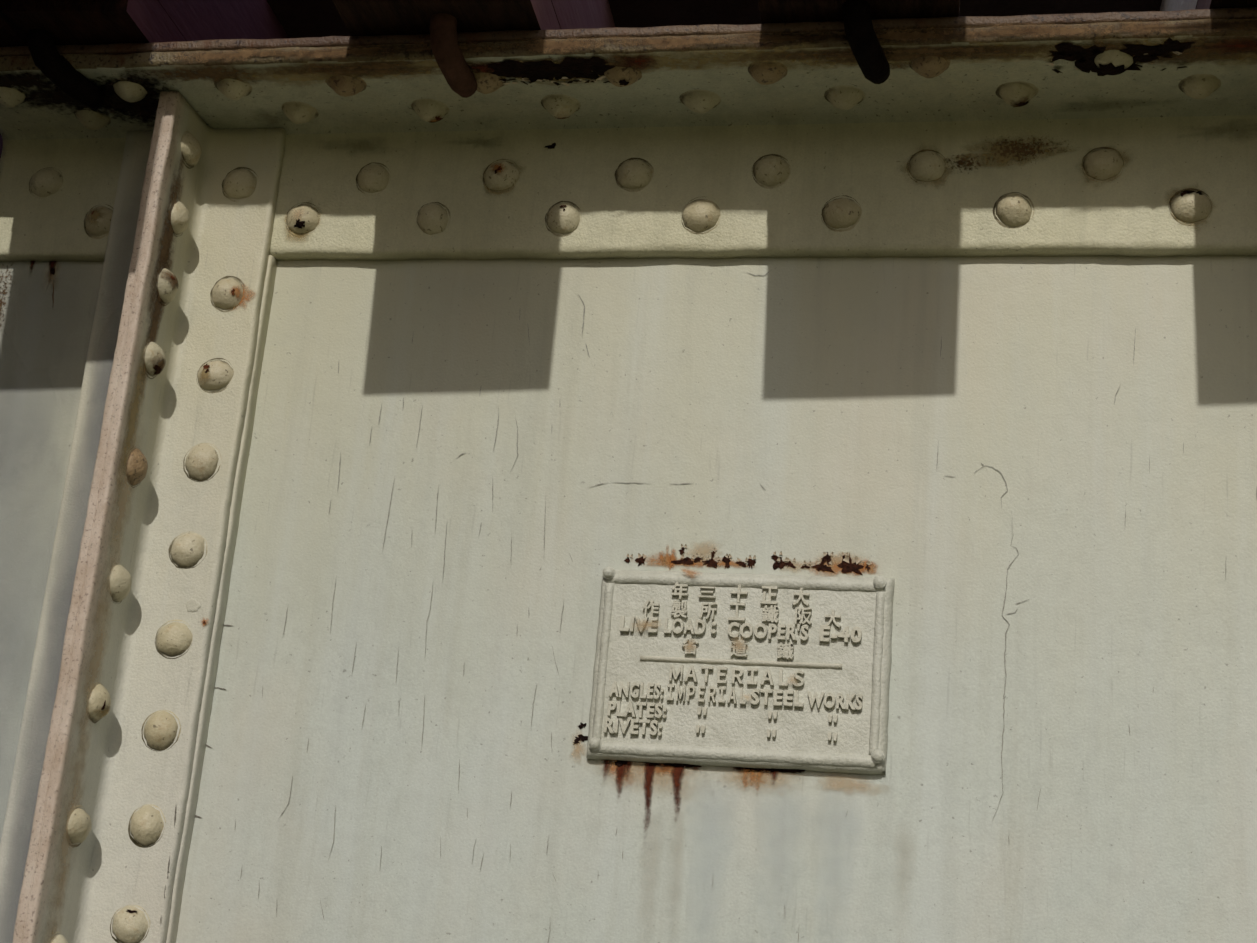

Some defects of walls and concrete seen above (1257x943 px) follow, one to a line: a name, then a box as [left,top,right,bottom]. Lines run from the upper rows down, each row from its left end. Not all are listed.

corrosion [932,136,1069,183]
corrosion [649,548,740,577]
corrosion [824,560,875,574]
crack [937,452,1030,842]
corrosion [604,759,702,827]